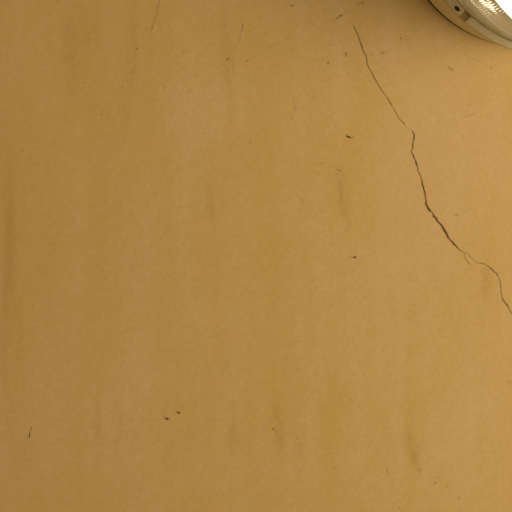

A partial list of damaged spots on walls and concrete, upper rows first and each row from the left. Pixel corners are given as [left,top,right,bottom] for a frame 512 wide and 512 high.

crack [411,133,458,248]